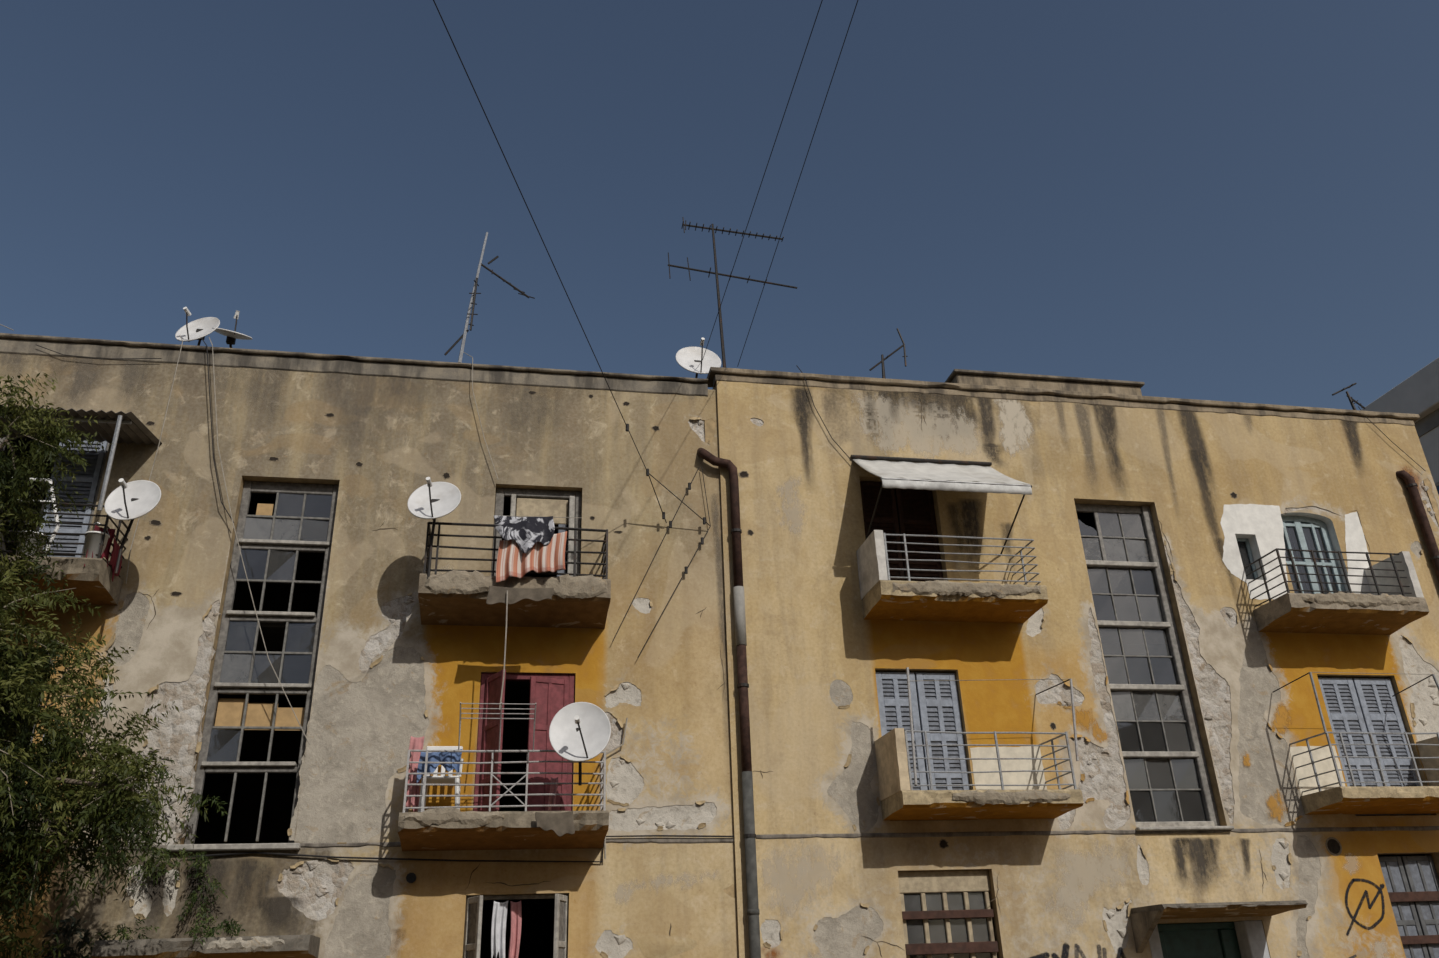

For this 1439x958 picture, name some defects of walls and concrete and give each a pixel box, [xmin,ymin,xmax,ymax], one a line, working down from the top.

damp [795,389,810,466]
damp [918,393,999,461]
damp [1077,405,1120,473]
damp [1180,404,1218,535]
damp [1346,415,1361,460]
spalling [123,600,221,846]
spalling [277,570,504,958]
spalling [952,607,1131,831]
spalling [1164,540,1342,958]
spalling [1399,635,1439,741]
spalling [125,864,180,920]
damp [1174,838,1215,883]